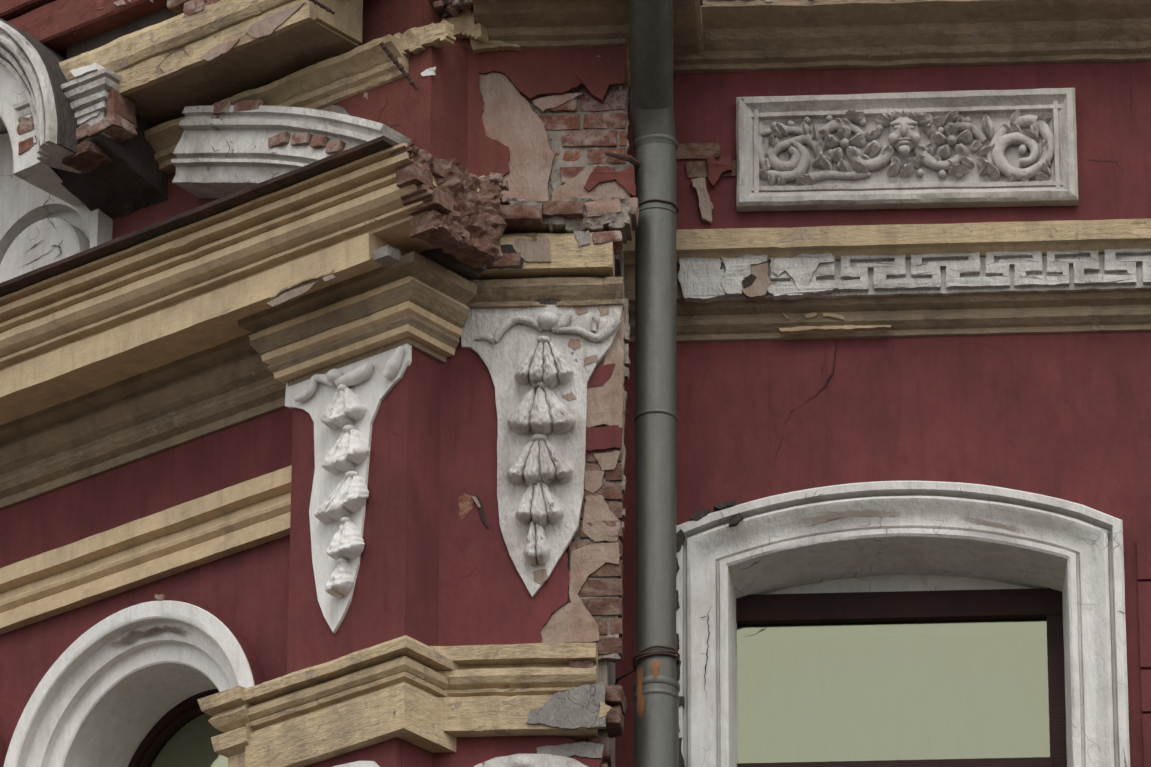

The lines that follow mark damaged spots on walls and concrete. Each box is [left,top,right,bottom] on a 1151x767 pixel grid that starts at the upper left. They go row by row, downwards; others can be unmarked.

flaking render [167,0,221,18]
spalling [394,0,521,57]
peeling [70,63,105,78]
flaking render [17,115,37,155]
flaking render [61,88,137,173]
spalling [479,72,636,201]
flaking render [676,143,737,225]
peeling [486,234,551,269]
spalling [678,253,891,334]
spalling [540,298,631,668]
spalling [526,682,627,767]
rust [637,662,661,715]